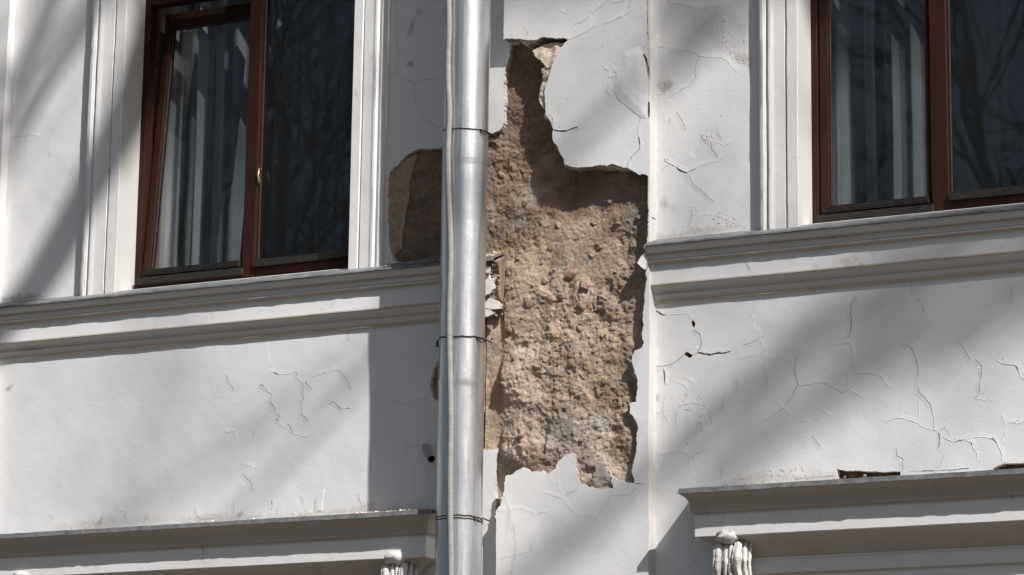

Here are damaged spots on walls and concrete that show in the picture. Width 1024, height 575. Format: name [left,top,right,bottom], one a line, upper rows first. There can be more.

crack [546,109,578,132]
crack [628,0,747,204]
flaking render [389,149,443,262]
flaking render [484,41,649,506]
crack [192,338,352,522]
flaking render [432,364,440,401]
crack [656,296,784,390]
spalling [840,470,901,479]
crack [883,342,1024,472]
crack [498,496,547,575]